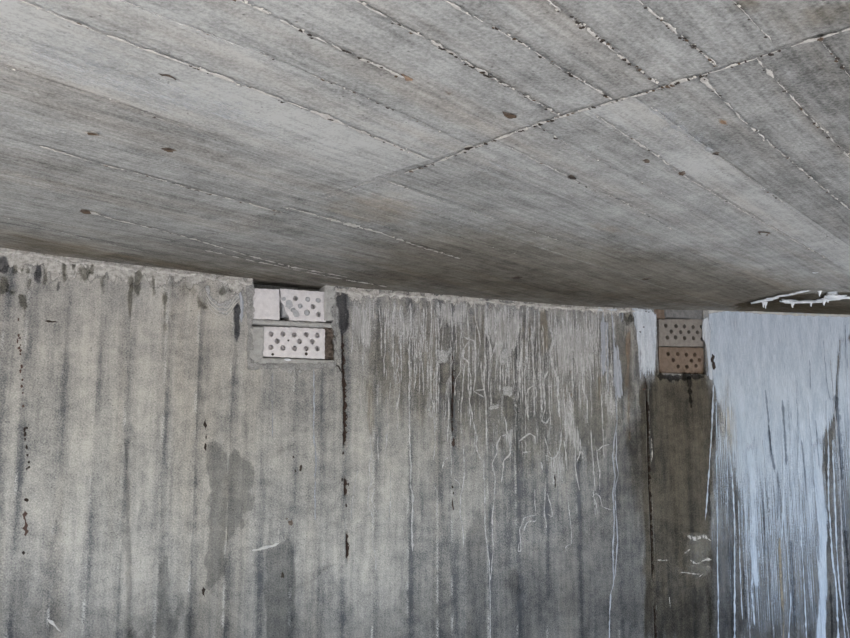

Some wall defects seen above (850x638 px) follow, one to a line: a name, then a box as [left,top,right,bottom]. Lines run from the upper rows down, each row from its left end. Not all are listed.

damp [335,286,657,638]
damp [680,290,850,638]